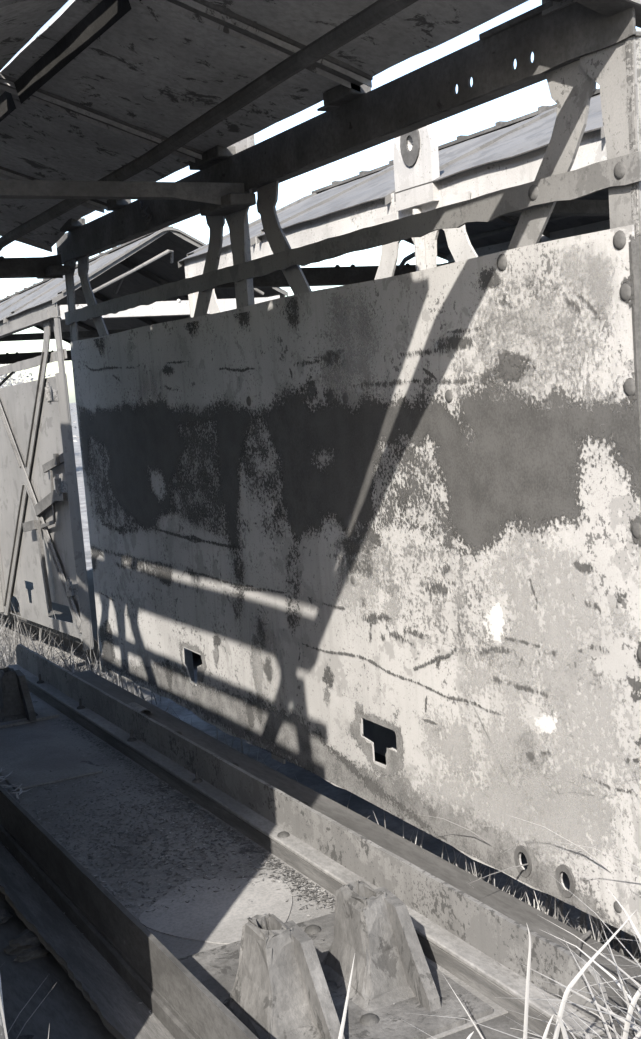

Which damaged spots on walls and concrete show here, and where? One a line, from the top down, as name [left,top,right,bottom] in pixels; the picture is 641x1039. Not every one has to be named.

rust [78,234,641,665]
peeling [332,526,429,646]
peeling [403,526,641,874]
rust [627,641,641,702]